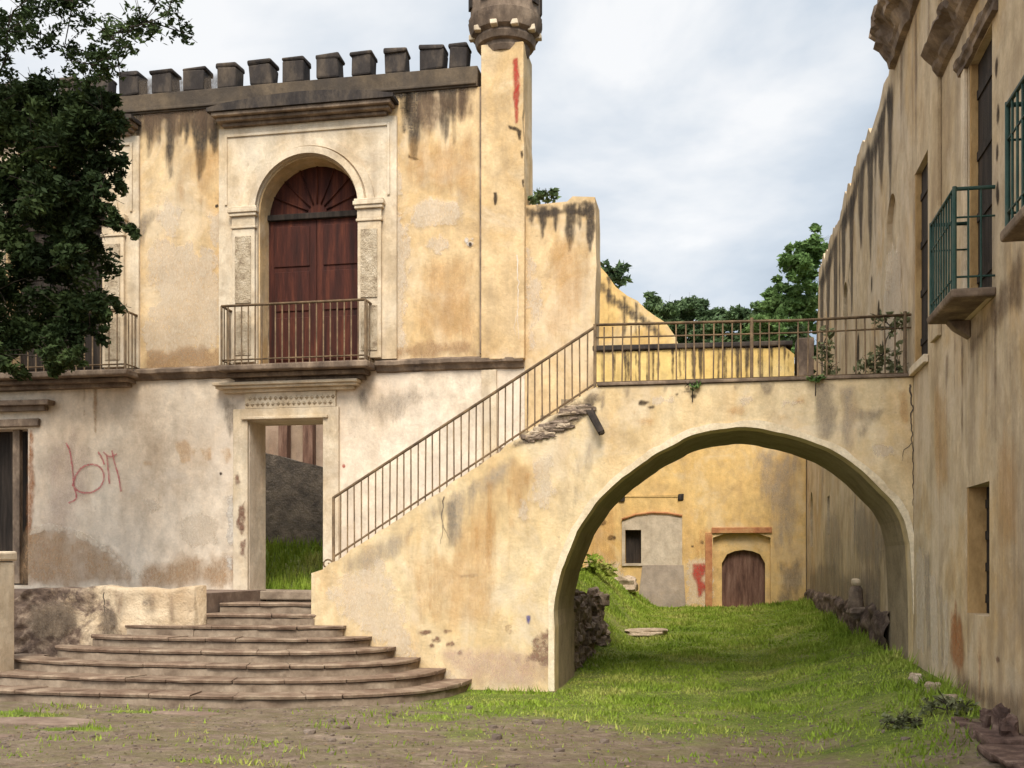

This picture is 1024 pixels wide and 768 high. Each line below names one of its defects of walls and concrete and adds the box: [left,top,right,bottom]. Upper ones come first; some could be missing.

leakage [136,109,218,178]
leakage [530,201,595,250]
leakage [817,55,902,436]
leakage [671,348,703,378]
leakage [718,346,786,391]
spalling [515,394,597,446]
crack [902,384,914,506]
peeling [226,496,245,569]
leakage [144,561,233,585]
spalling [26,602,74,638]
spalling [100,610,116,629]
spalling [528,634,548,666]